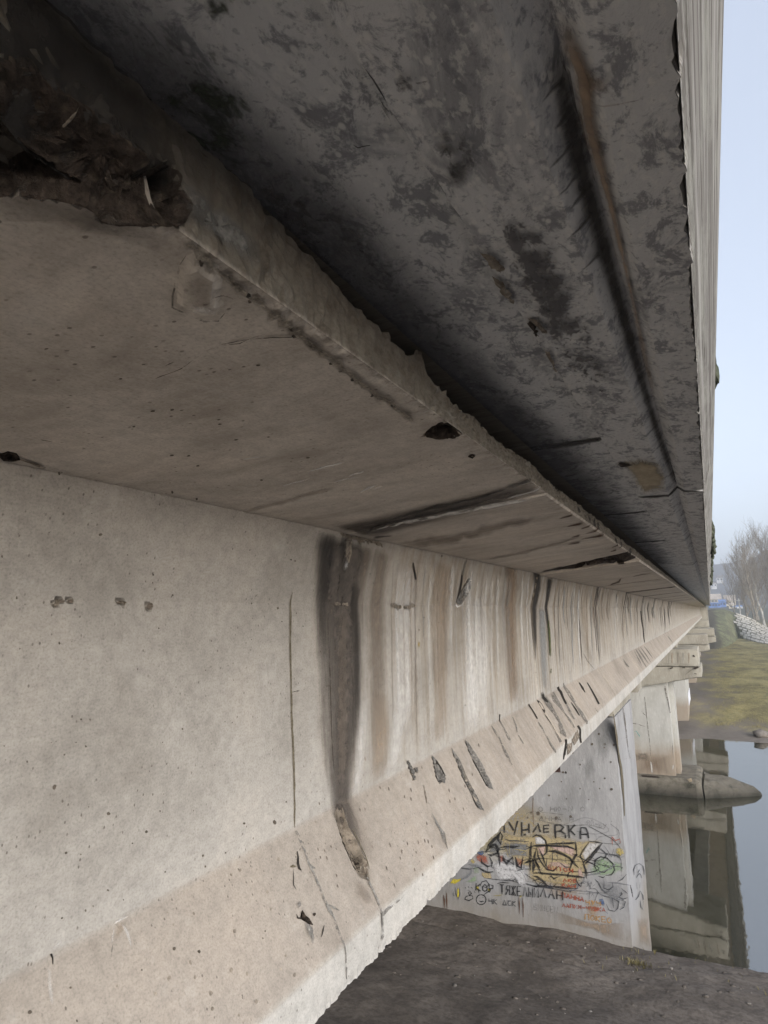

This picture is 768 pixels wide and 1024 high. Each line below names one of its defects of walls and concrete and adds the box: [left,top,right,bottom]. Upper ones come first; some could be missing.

spalling [0,56,250,252]
leakage [0,0,664,562]
leakage [545,78,699,498]
spalling [0,451,44,469]
spalling [422,422,462,440]
crack [289,592,347,979]
leakage [321,479,537,842]
spalling [404,740,493,810]
spalling [528,682,600,765]
spalling [296,903,316,939]
spalling [317,807,400,940]